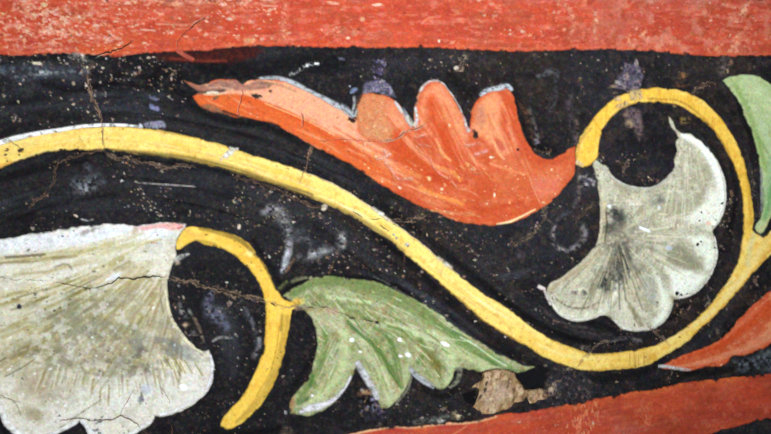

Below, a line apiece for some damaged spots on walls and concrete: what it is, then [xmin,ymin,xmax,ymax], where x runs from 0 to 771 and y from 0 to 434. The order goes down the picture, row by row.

crack [87,40,132,139]
crack [0,275,372,322]
crack [62,396,139,426]
flaking render [463,367,590,414]